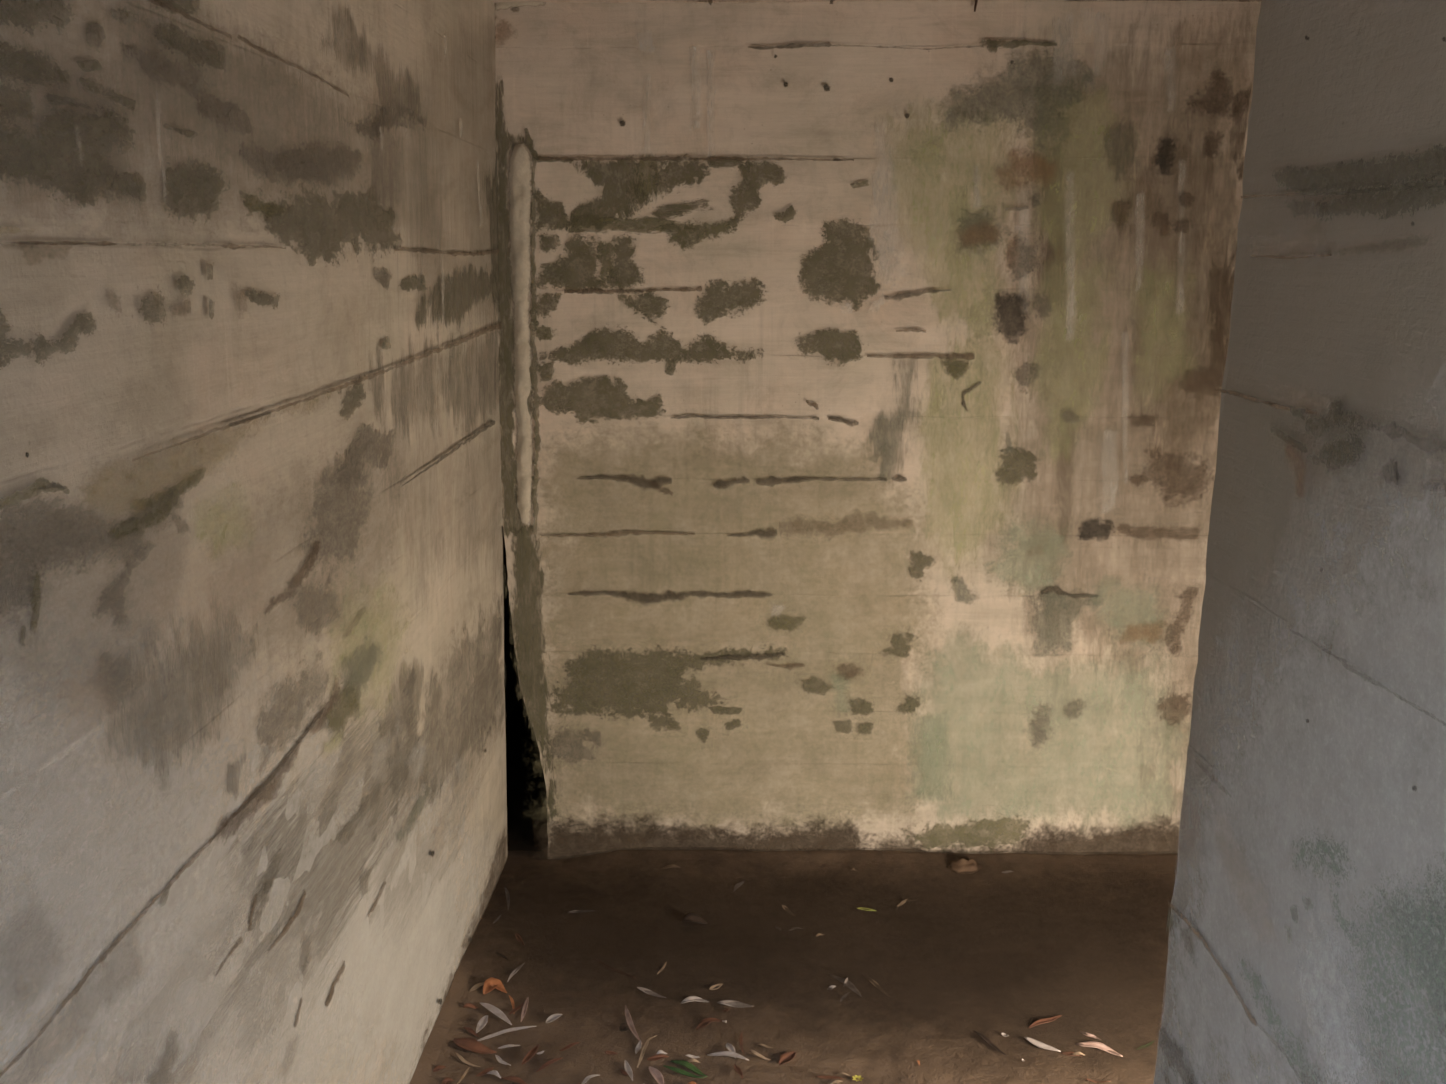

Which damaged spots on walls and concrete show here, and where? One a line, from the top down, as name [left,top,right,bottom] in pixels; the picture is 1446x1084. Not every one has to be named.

crack [748,42,970,50]
leakage [0,0,499,329]
leakage [911,39,1135,372]
leakage [1155,139,1175,175]
leakage [1275,144,1446,220]
leakage [527,154,786,425]
leakage [930,440,1039,554]
leakage [1131,453,1205,501]
leakage [0,495,1446,1084]